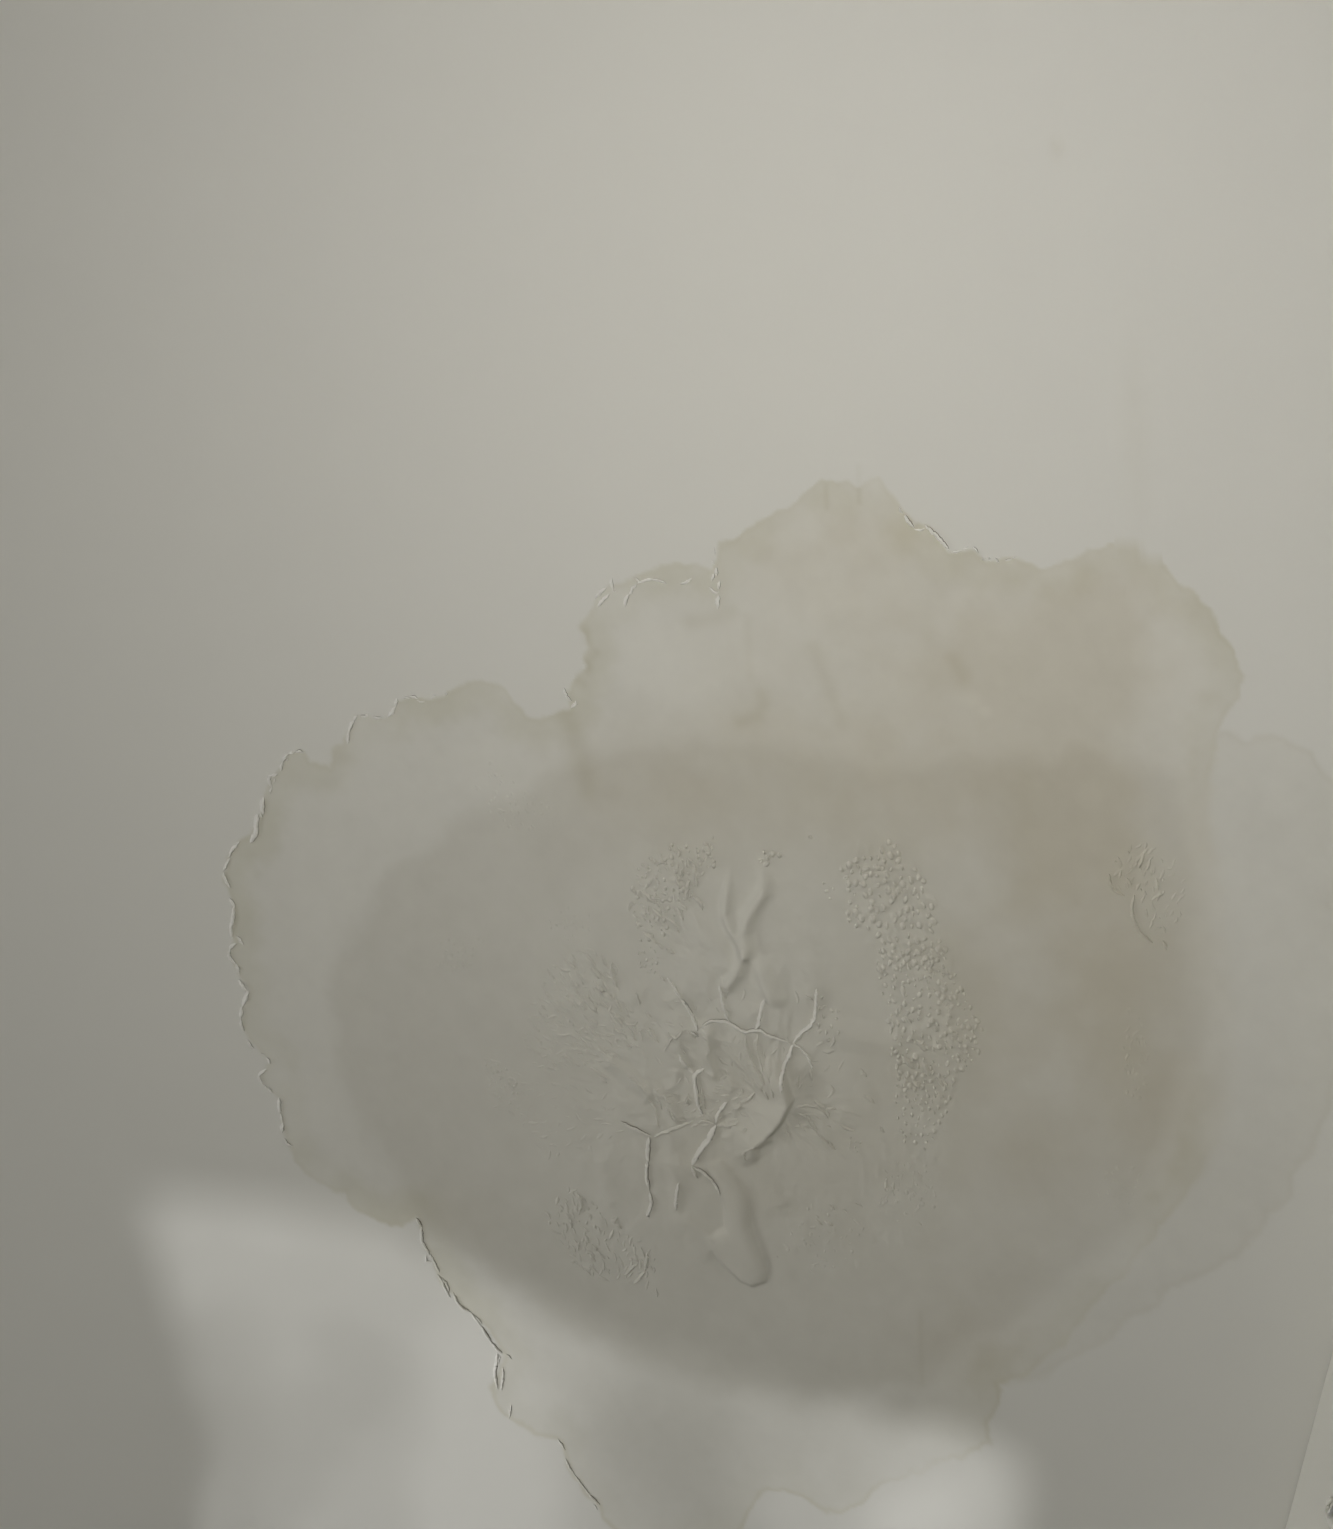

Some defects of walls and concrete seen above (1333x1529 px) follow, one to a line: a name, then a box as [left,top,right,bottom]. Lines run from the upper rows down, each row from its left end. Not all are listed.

peeling [223,749,304,1146]
crack [621,978,818,1219]
water stain [220,256,1333,1529]